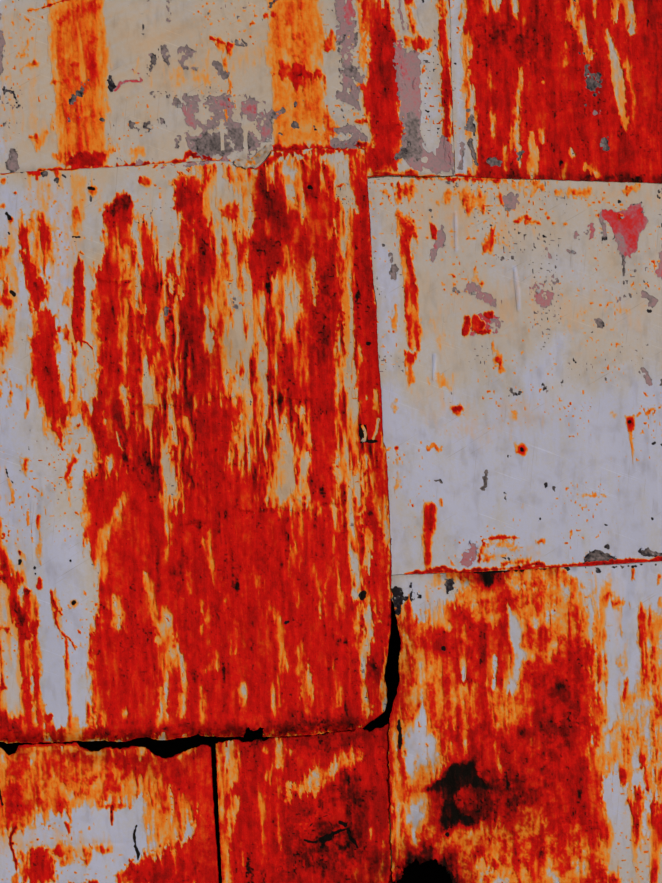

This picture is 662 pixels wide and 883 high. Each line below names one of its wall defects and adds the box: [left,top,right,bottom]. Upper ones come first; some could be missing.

peeling [129,118,168,133]
peeling [146,45,199,77]
peeling [150,91,277,169]
peeling [331,123,368,149]
peeling [335,0,366,110]
peeling [393,0,459,188]
rust [435,0,662,218]
peeling [567,202,650,286]
rust [0,0,436,743]
rust [216,501,662,883]
rust [0,743,218,883]